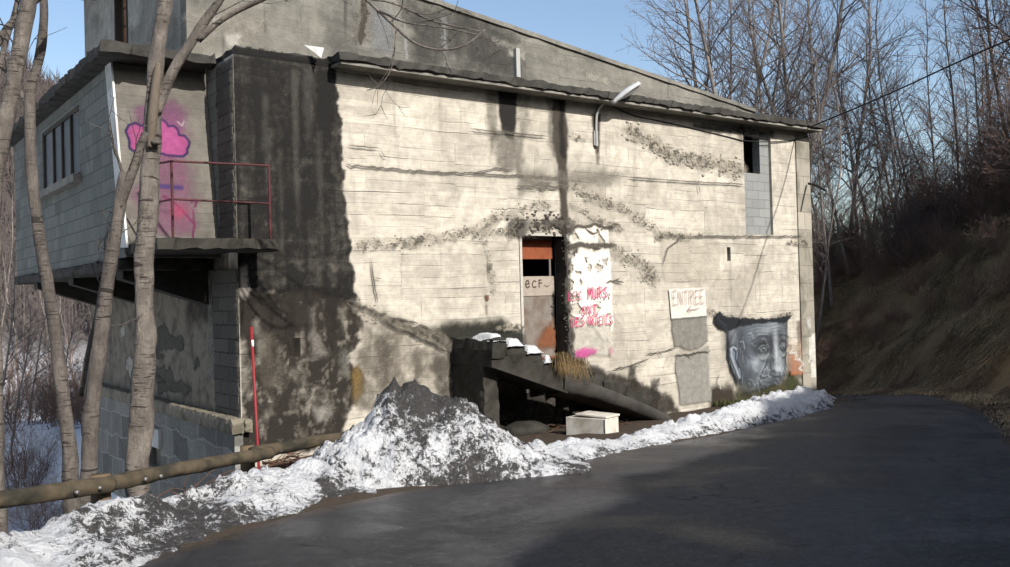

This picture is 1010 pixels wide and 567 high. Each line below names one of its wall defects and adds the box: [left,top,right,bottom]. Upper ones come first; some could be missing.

crack [347,145,571,190]
crack [470,128,547,139]
leakage [489,91,619,232]
leakage [187,46,454,452]
peeling [356,183,691,362]
flaking render [155,323,192,397]